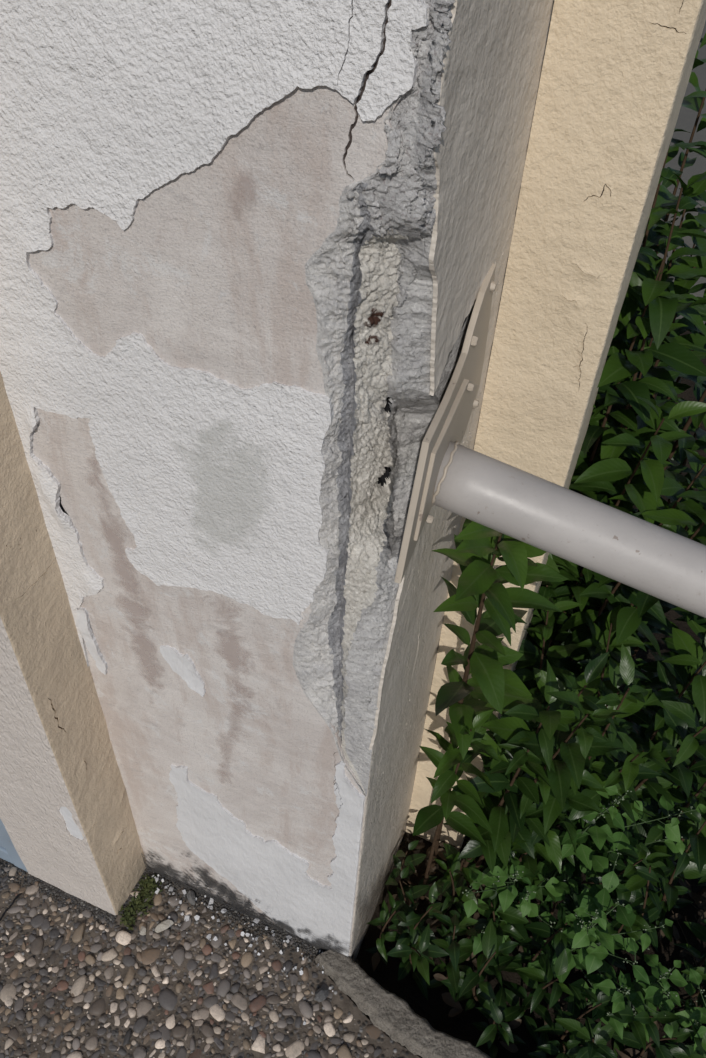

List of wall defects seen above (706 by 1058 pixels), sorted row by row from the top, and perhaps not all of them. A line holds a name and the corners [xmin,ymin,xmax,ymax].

peeling [29,0,476,956]
crack [327,0,392,793]
corrosion [362,308,384,345]
leakage [141,840,401,962]